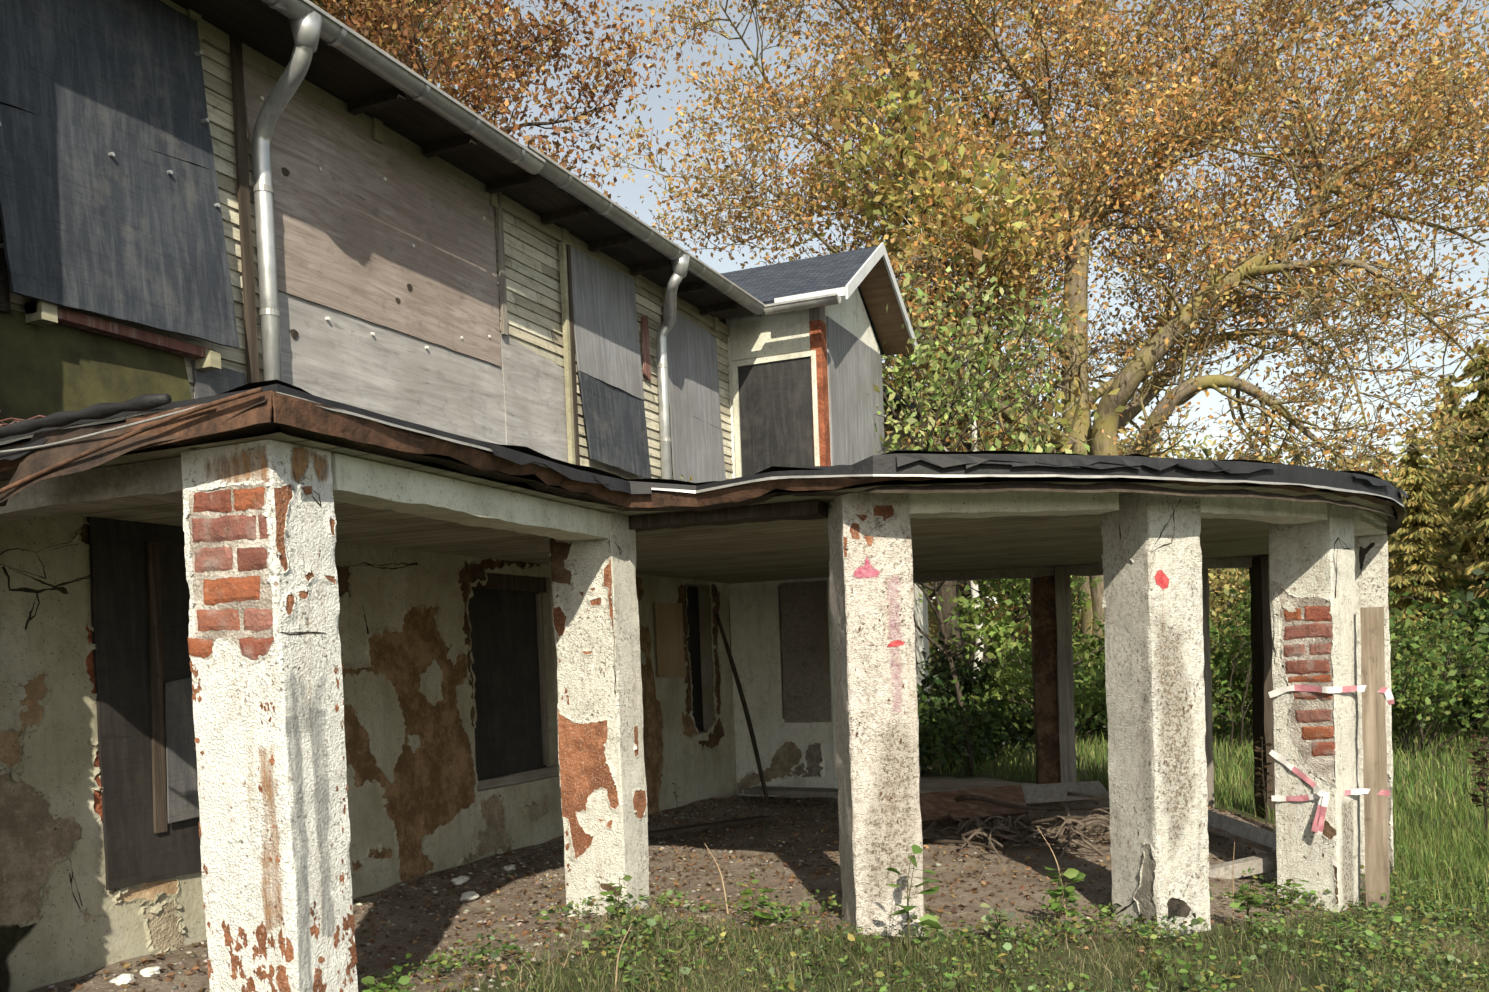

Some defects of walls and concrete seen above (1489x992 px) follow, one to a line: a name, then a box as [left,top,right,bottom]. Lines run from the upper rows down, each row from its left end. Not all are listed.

leakage [0,923,35,992]
crack [0,541,91,631]
flaking render [0,670,103,927]
flaking render [104,877,186,954]
peeling [203,893,294,992]
flaking render [183,478,353,702]
leakage [286,679,334,992]
flaking render [310,535,615,992]
flaking render [636,574,646,605]
peeling [557,581,725,886]
flaking render [737,739,825,796]
flaking render [1270,578,1336,788]